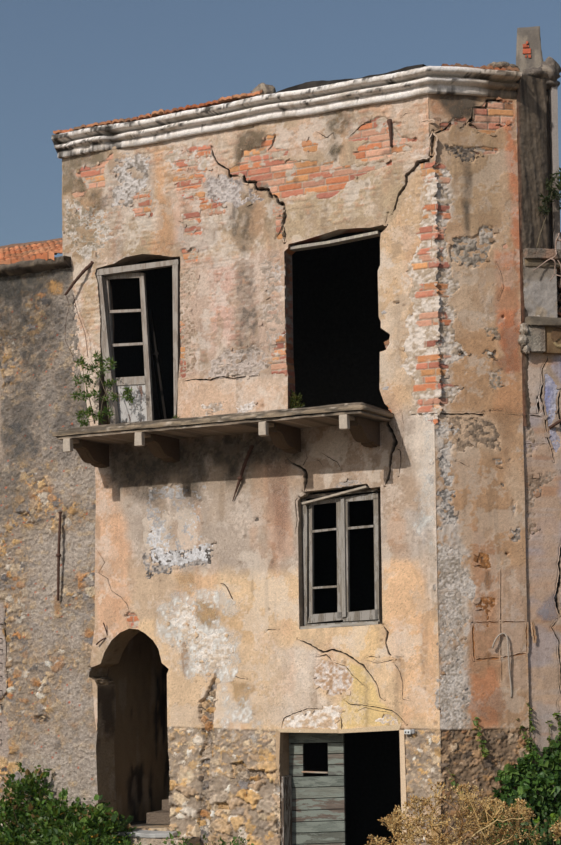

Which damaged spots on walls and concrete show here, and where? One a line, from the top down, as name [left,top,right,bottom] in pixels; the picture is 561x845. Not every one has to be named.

peeling [63,152,153,260]
crack [211,147,288,242]
spalling [163,117,417,381]
crack [384,97,502,226]
peeling [70,286,101,379]
spalling [399,161,511,530]
crack [384,410,416,486]
crack [437,356,561,462]
peeling [142,482,217,579]
peeling [283,660,355,729]
crack [297,625,411,730]
crack [471,545,561,711]